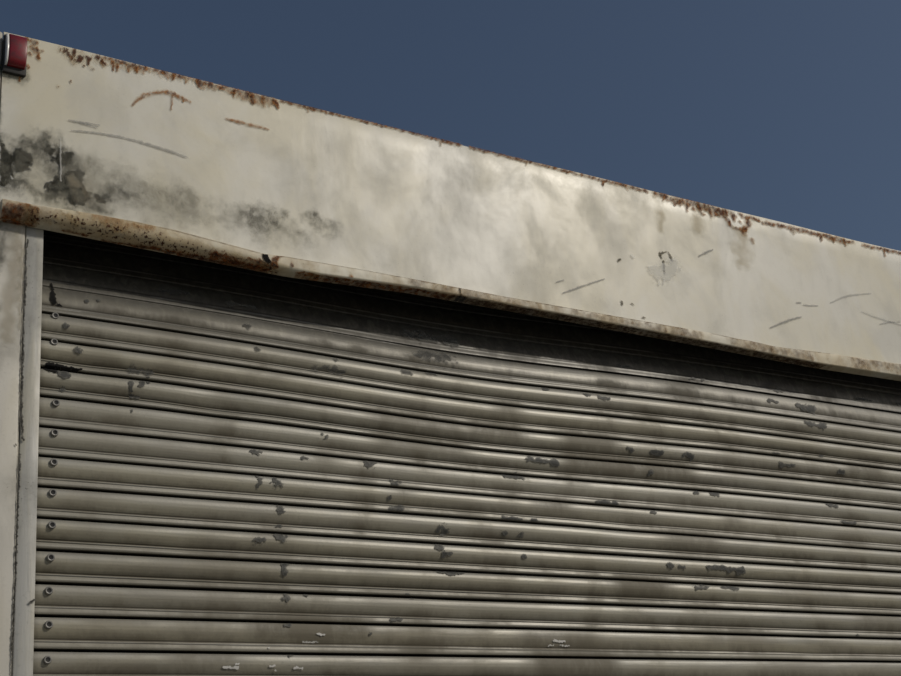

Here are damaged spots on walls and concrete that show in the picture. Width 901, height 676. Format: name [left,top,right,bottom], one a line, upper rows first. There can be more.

rust [60,47,851,246]
rust [0,199,825,369]
peeling [434,522,453,558]